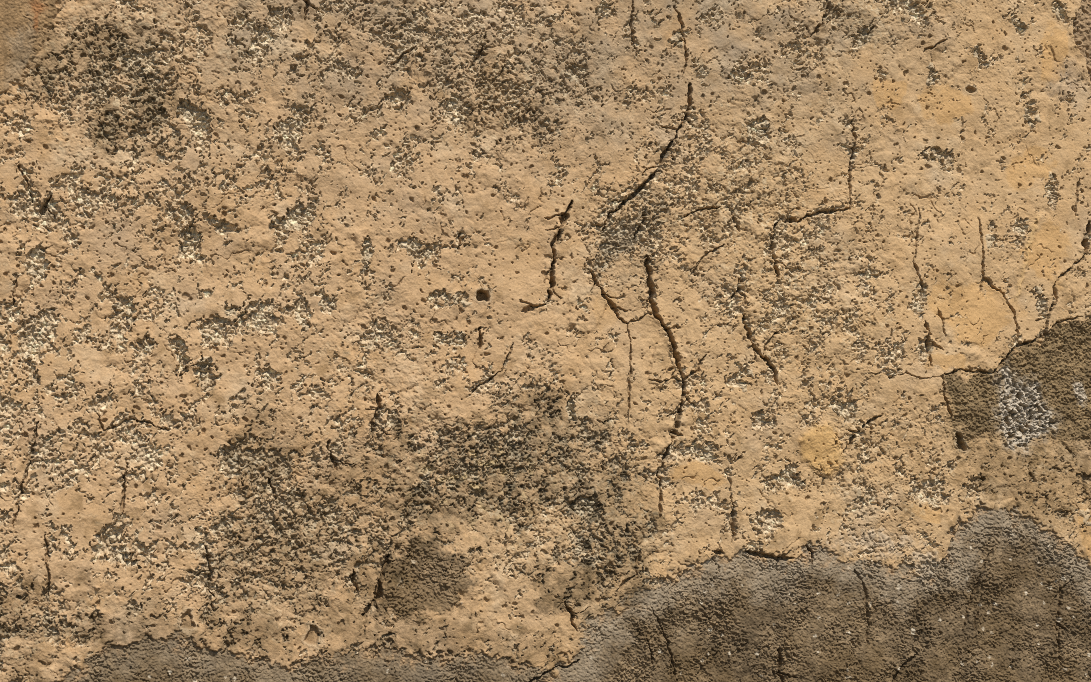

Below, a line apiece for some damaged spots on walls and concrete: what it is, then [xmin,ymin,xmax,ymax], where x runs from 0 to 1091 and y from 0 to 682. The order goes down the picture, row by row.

spalling [17,319,45,391]
spalling [26,244,50,289]
crack [519,0,707,519]
crack [683,206,741,276]
crack [731,274,780,386]
crack [769,119,857,278]
crack [867,178,1091,420]
spalling [89,524,156,572]
crack [713,473,815,565]
spalling [1069,507,1091,533]